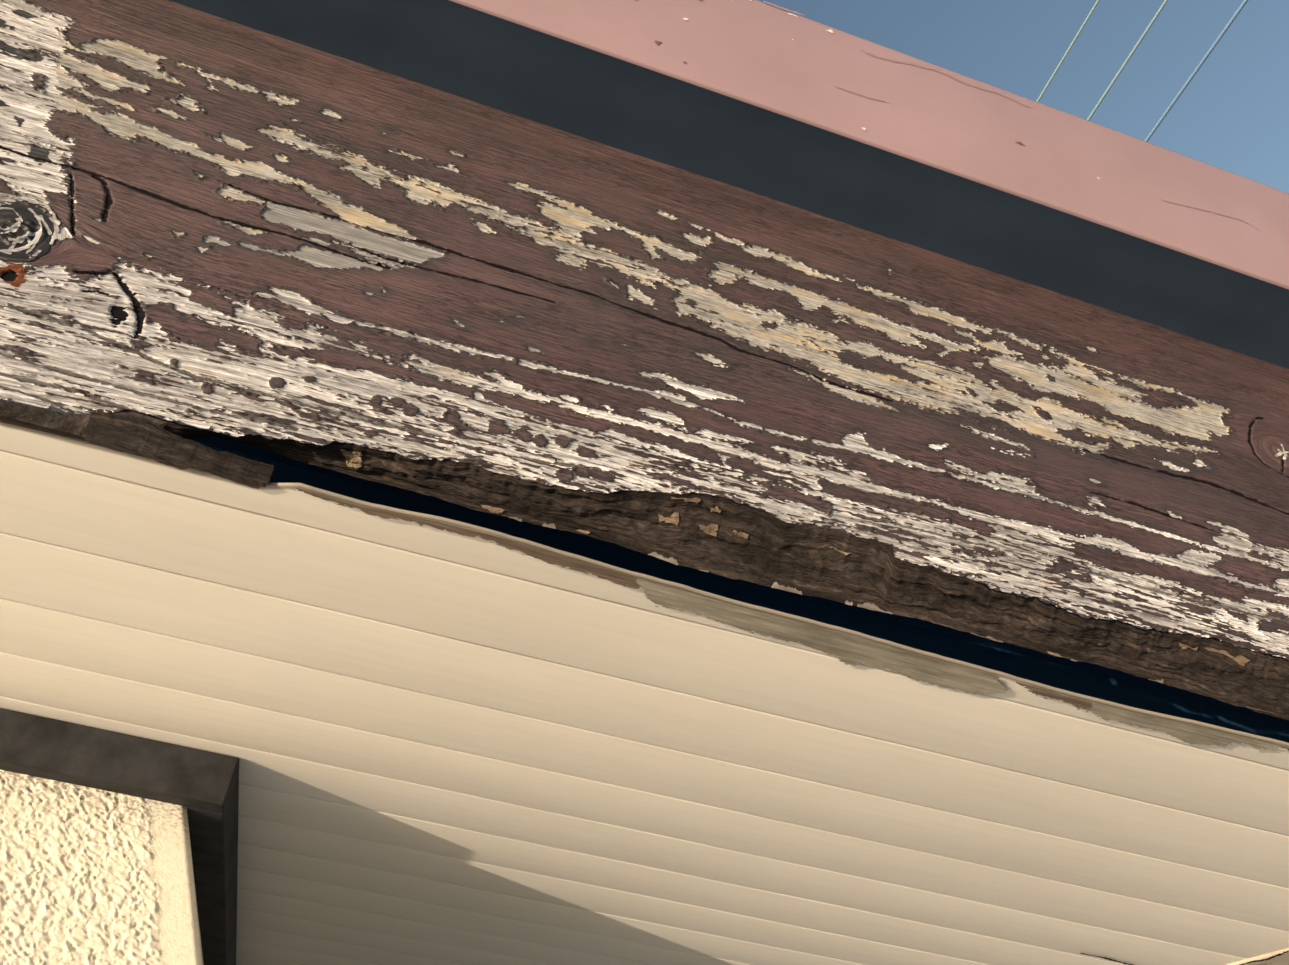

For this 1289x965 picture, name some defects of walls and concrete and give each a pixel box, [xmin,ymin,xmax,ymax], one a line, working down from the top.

peeling [0,0,1231,472]
rust [0,262,29,290]
crack [0,145,893,401]
crack [0,269,602,470]
peeling [0,254,1289,658]
crack [1092,492,1215,531]
crack [1078,447,1289,515]
crack [1275,444,1289,459]
peeling [292,488,1289,751]
crack [1080,953,1133,965]
crack [1240,951,1288,965]